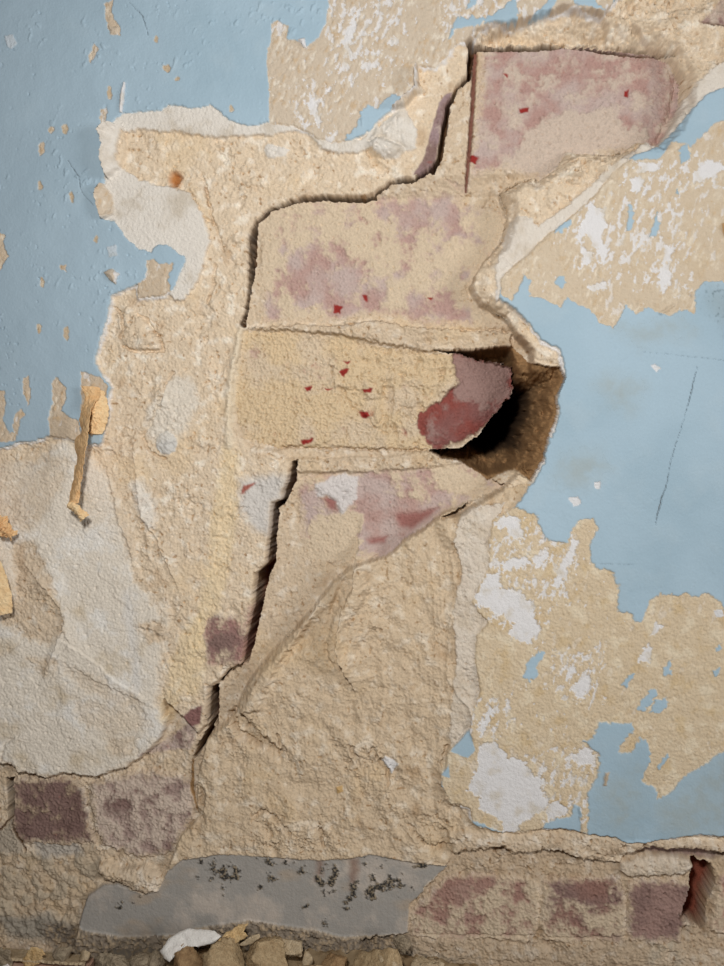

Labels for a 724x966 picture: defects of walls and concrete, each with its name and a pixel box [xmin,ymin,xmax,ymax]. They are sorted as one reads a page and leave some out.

crack [240,223,261,328]
peeling [93,0,724,301]
crack [292,42,674,204]
flaking render [0,42,468,958]
crack [191,463,298,813]
flaking render [167,47,724,966]
crack [643,352,724,525]